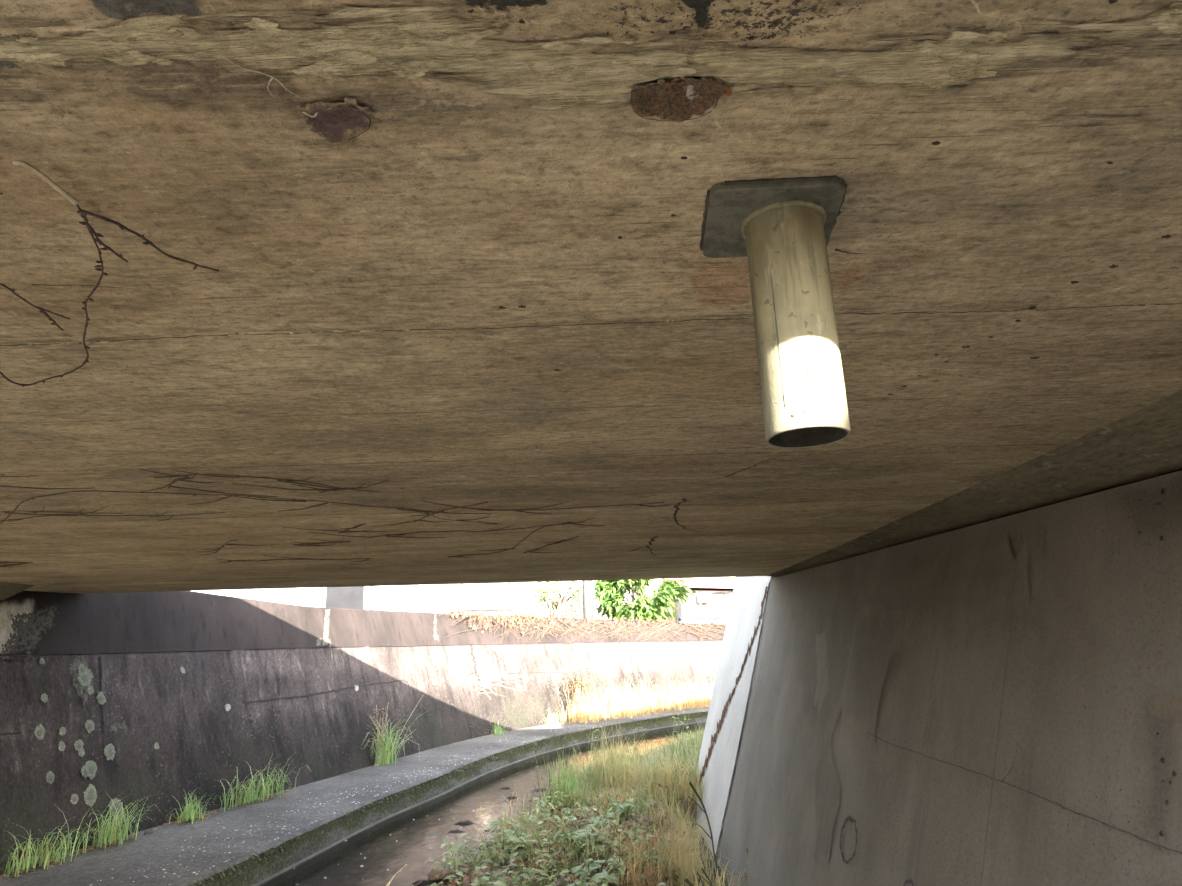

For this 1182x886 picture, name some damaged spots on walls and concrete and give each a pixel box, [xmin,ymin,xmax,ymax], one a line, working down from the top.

leakage [86,0,208,23]
mould [465,0,549,23]
mould [576,0,888,49]
leakage [0,61,100,110]
leakage [103,51,527,126]
peeling [0,0,1182,130]
spalling [297,97,372,143]
crack [32,282,132,290]
crack [595,489,942,557]
leakage [0,595,62,665]
crack [867,732,1182,854]